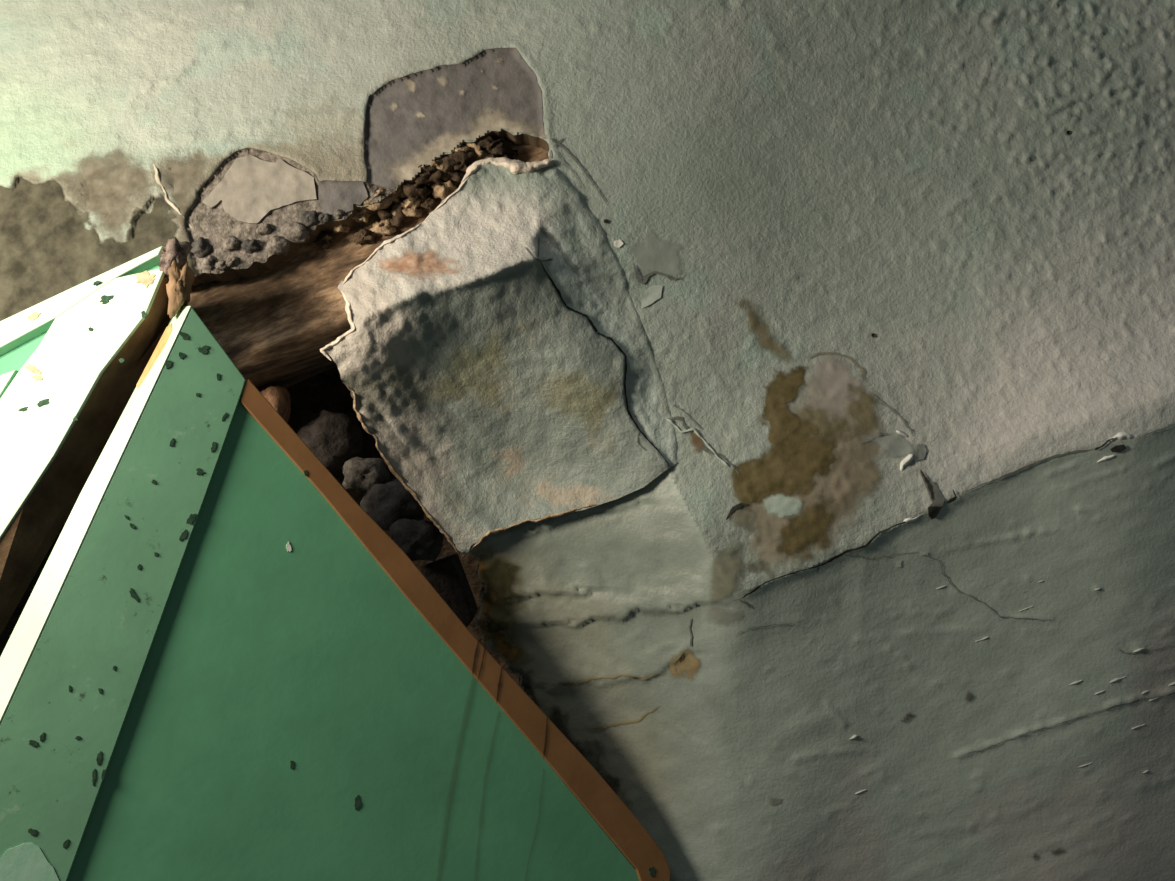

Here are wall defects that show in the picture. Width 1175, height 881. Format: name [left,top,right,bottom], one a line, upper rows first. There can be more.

flaking render [153,48,552,274]
crack [525,237,739,475]
damp [708,301,878,623]
crack [859,394,913,444]
crack [734,514,1049,636]
crack [961,449,1091,494]